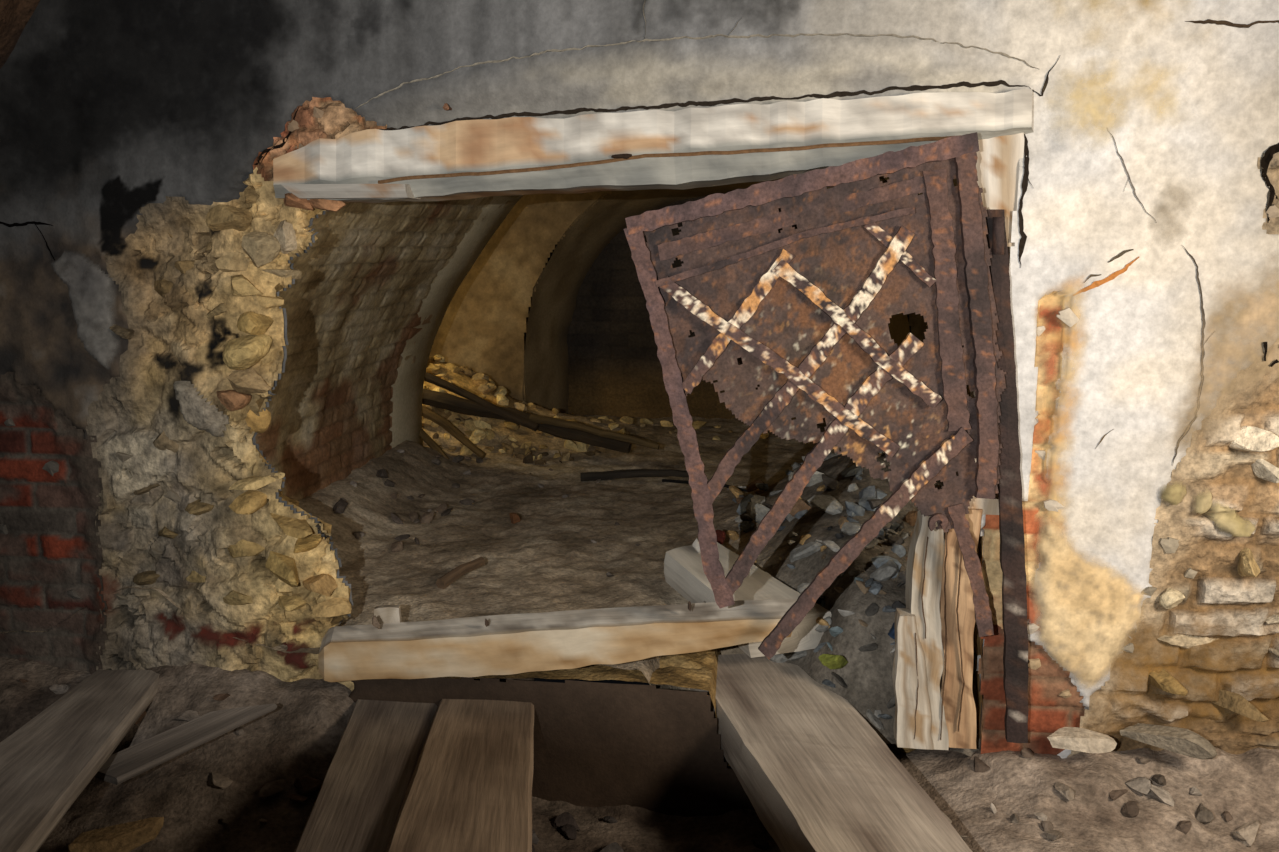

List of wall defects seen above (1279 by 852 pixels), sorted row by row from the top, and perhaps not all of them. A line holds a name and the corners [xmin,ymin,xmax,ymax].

crack [355,0,1059,130]
crack [1185,19,1279,28]
crack [0,221,55,262]
crack [1018,134,1033,268]
spalling [1257,152,1279,234]
crack [1260,143,1279,223]
spalling [86,97,387,682]
corrosion [1041,286,1080,529]
spalling [978,249,1279,757]